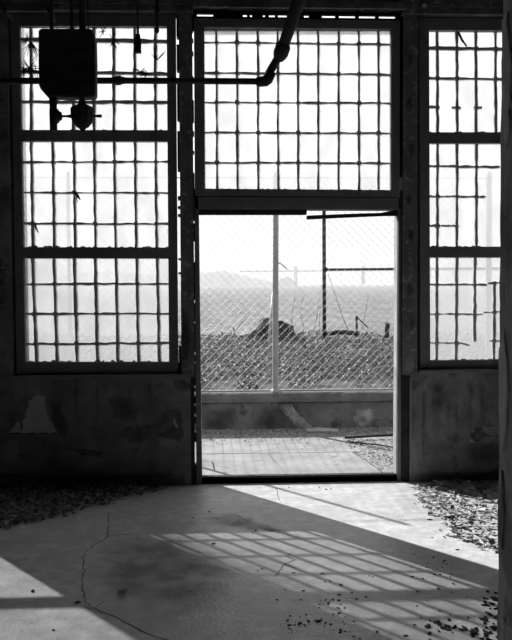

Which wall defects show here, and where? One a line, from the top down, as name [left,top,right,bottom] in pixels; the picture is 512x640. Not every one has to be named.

peeling [8,394,59,434]
crack [81,512,167,640]